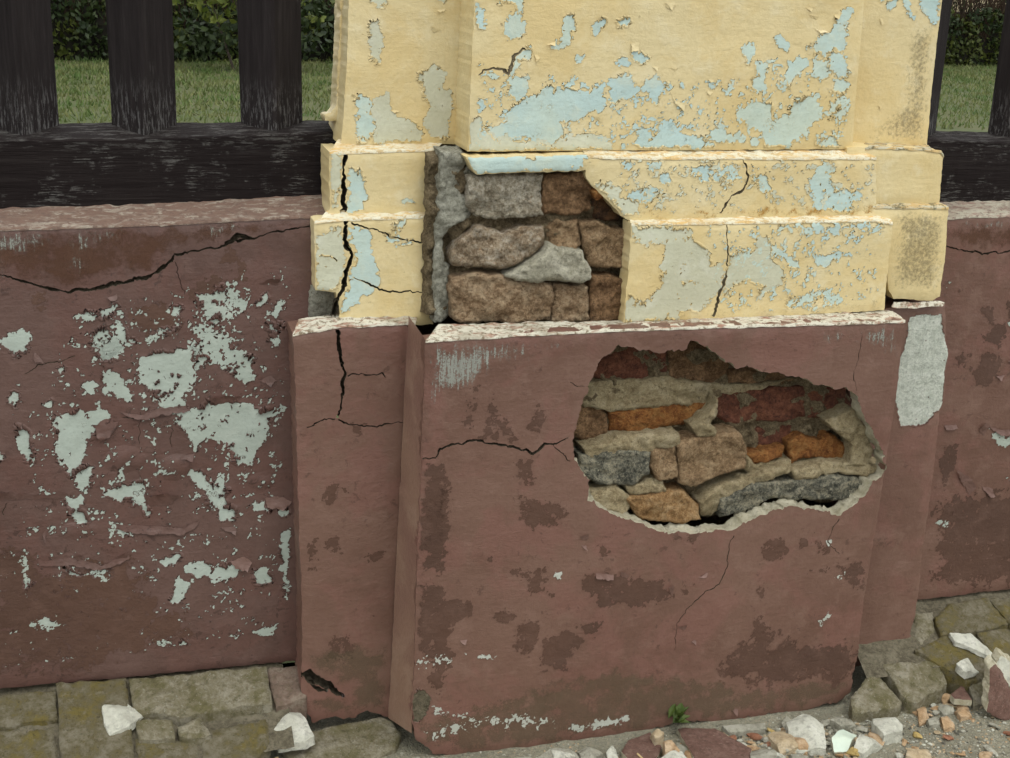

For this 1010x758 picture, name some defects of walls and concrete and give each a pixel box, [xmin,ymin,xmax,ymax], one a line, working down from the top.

peeling [879,0,941,25]
flaking render [308,0,885,323]
crack [0,225,310,294]
crack [307,154,422,428]
crack [711,156,749,317]
crack [946,246,1010,255]
flaking render [895,300,1010,428]
peeling [0,244,292,651]
crack [422,438,569,461]
flaking render [565,341,877,544]
damp [423,706,555,740]
damp [568,715,630,732]